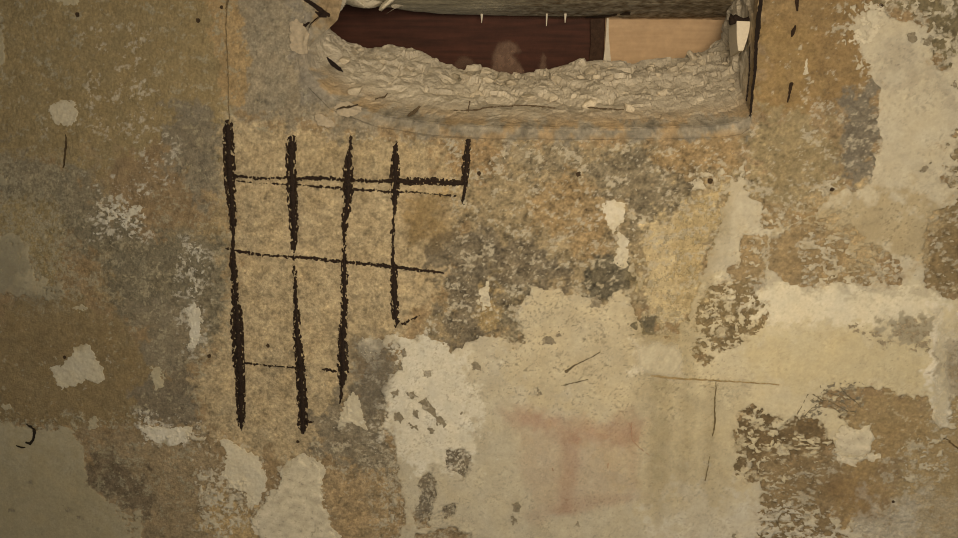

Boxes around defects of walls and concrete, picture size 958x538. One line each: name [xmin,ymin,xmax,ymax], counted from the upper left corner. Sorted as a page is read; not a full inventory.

peeling [311,0,330,10]
spalling [728,14,750,25]
peeling [865,0,958,71]
peeling [695,217,903,353]
peeling [542,331,562,345]
peeling [692,336,714,368]
peeling [848,318,932,352]
peeling [394,391,447,434]
peeling [732,349,958,538]
peeling [446,449,472,479]
peeling [412,473,472,538]